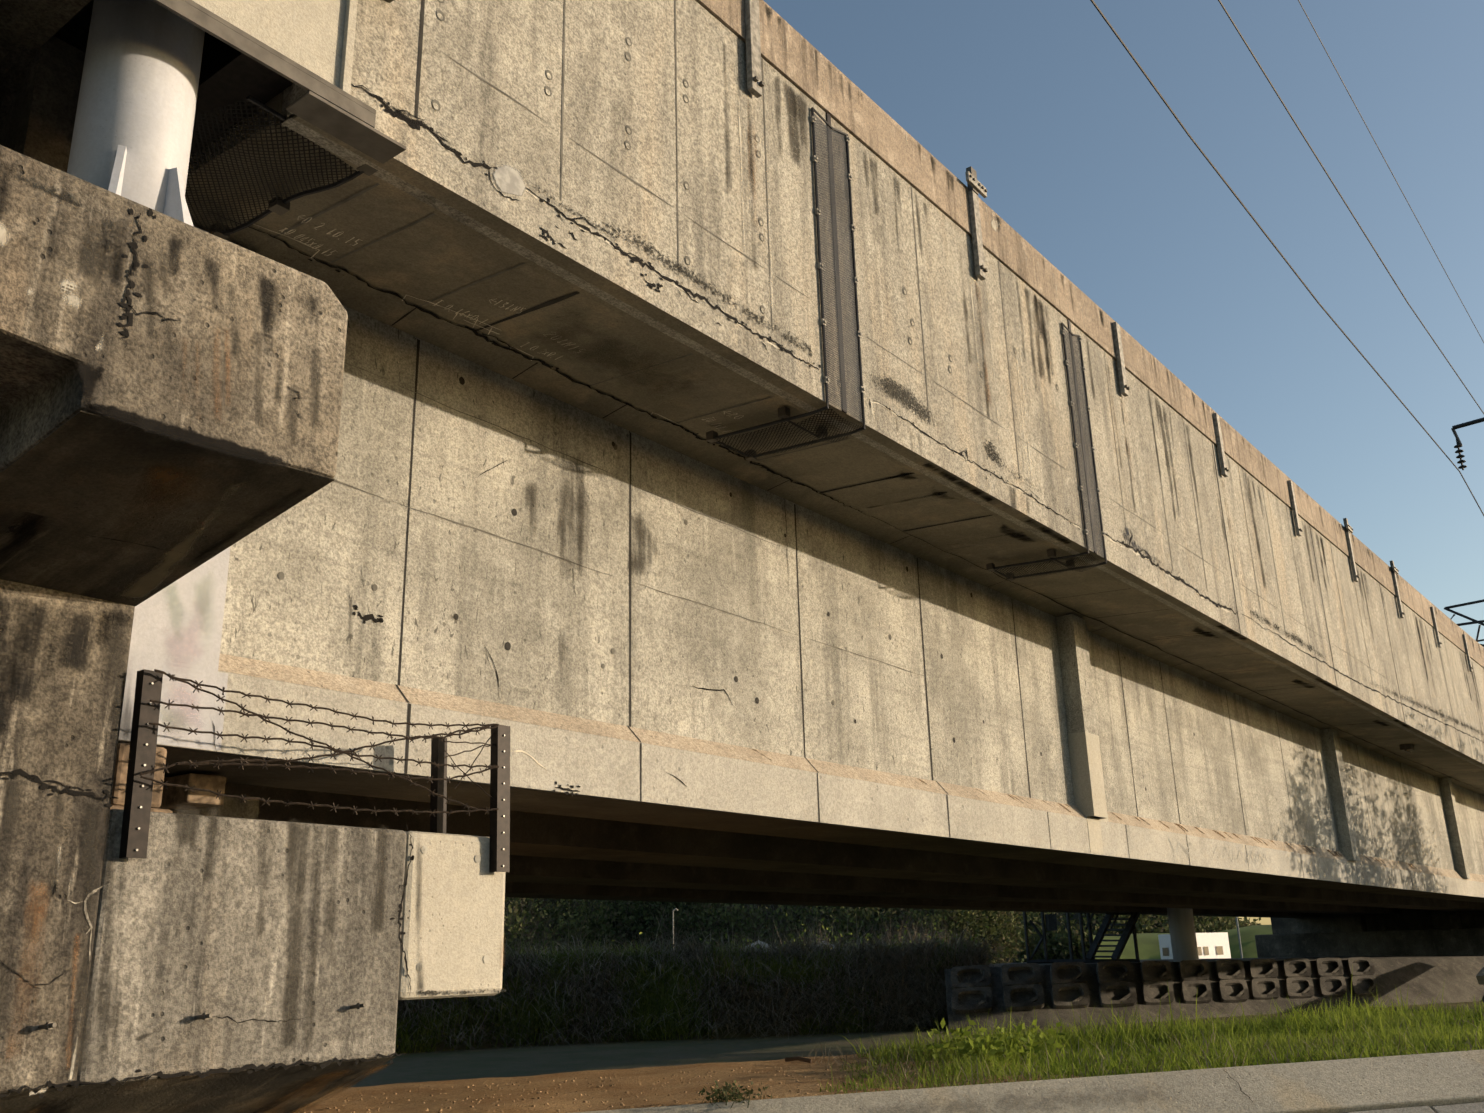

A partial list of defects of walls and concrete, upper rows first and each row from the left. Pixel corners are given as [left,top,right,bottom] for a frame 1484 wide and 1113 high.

damp [776,80,806,162]
crack [351,83,821,372]
damp [262,277,275,352]
damp [1017,284,1053,383]
damp [560,463,584,566]
damp [630,516,650,570]
crack [217,214,1484,790]
damp [0,598,128,731]
damp [114,691,132,743]
crack [0,768,118,807]
damp [70,944,118,1079]
crack [214,1015,306,1023]